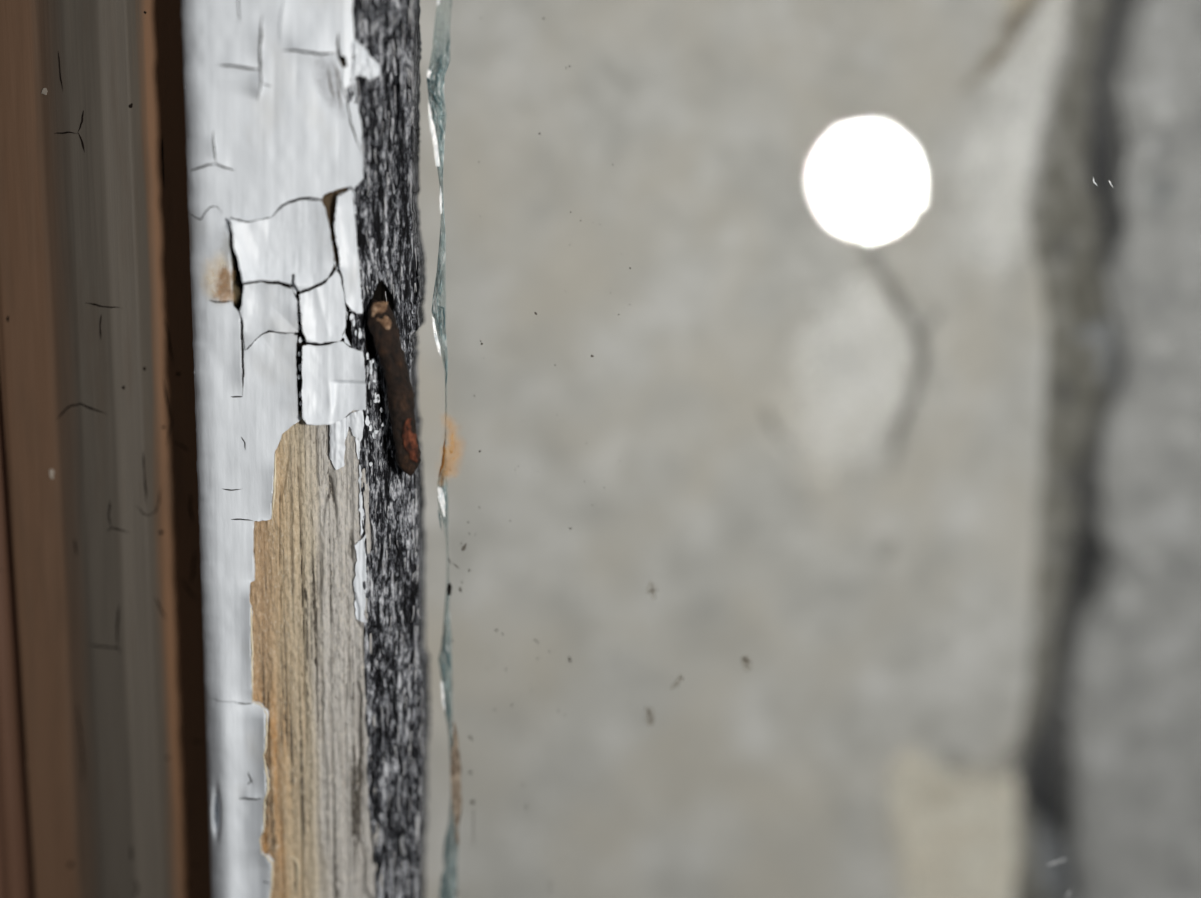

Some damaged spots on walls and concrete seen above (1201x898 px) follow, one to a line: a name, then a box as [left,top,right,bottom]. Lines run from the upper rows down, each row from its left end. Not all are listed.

crack [217,0,360,148]
crack [162,131,235,183]
crack [250,197,320,222]
crack [209,276,350,416]
rust [402,418,418,463]
rust [438,434,455,478]
peeling [229,189,382,898]